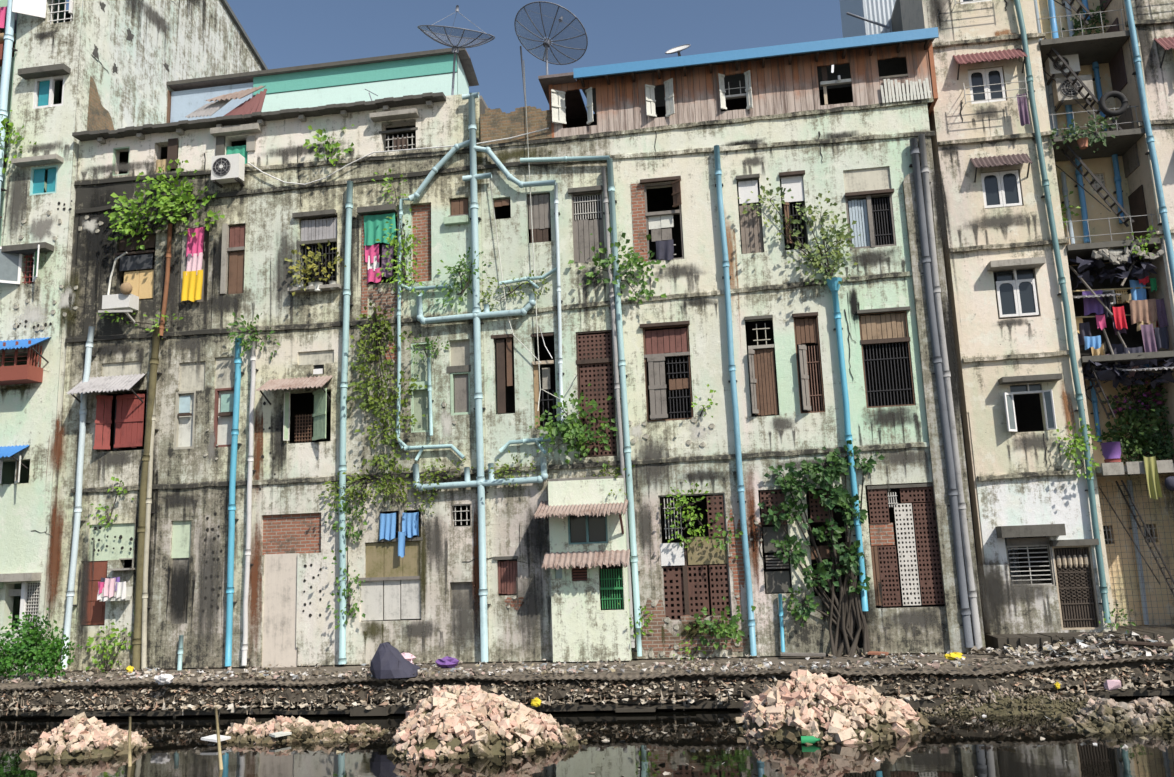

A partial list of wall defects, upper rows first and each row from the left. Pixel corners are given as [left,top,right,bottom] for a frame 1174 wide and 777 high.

damp [126,0,206,44]
flaking render [87,76,114,131]
damp [972,106,1016,146]
damp [726,139,772,179]
rust [1062,392,1075,429]
rust [46,419,64,474]
damp [858,407,930,485]
rust [47,500,64,605]
damp [98,448,197,639]
damp [167,536,222,642]
damp [629,506,652,617]
damp [969,561,1052,623]